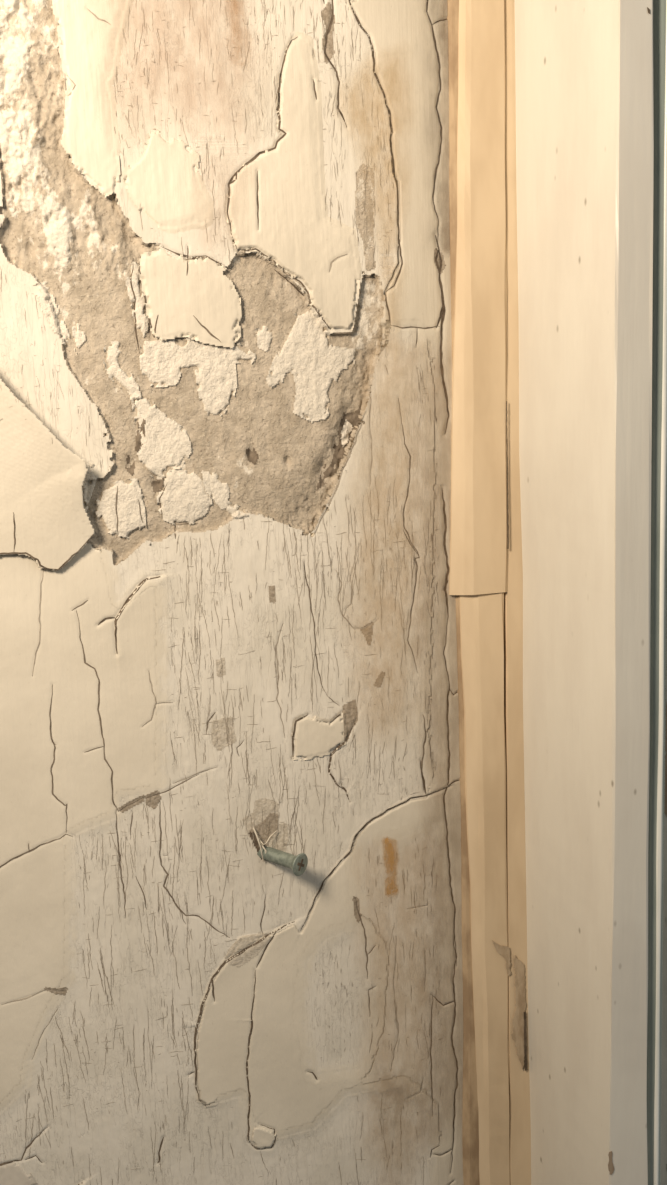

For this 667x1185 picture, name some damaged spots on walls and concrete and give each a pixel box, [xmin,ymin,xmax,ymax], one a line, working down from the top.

crack [130,37,331,349]
crack [313,0,449,433]
crack [0,486,198,868]
peeling [0,0,456,1185]
crack [73,365,459,1185]
crack [0,1127,47,1166]
crack [2,990,66,1054]